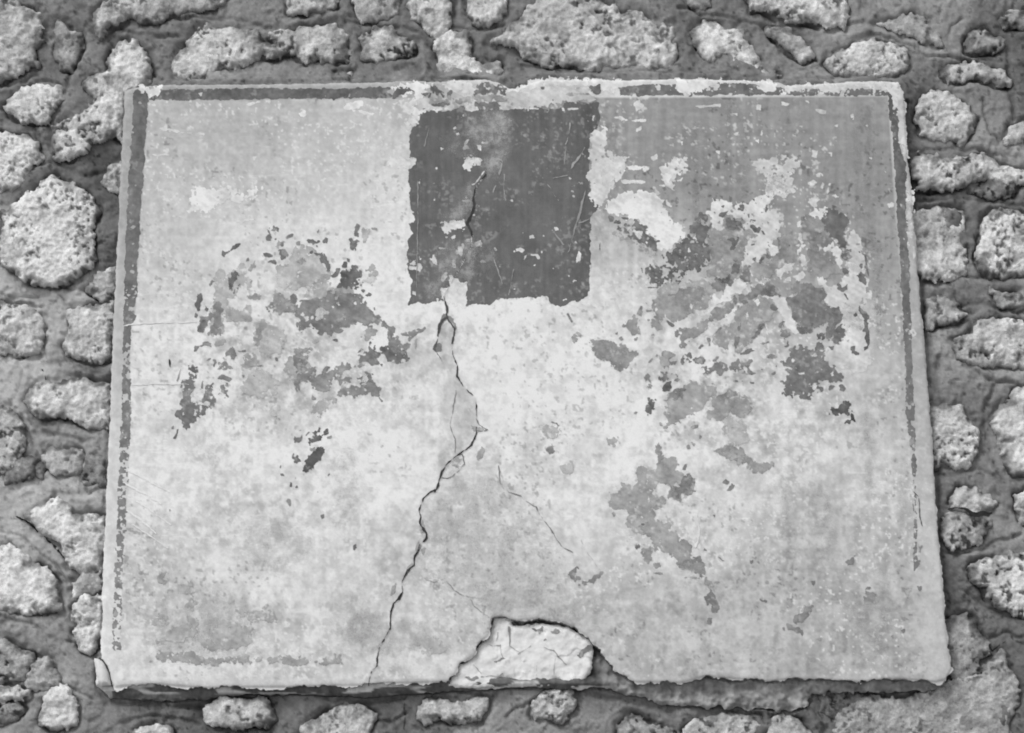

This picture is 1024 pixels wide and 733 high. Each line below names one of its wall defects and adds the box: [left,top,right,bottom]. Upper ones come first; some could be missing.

crack [465,172,486,237]
peeling [887,185,916,259]
peeling [390,75,910,475]
peeling [171,224,426,506]
crack [368,298,600,686]
peeling [608,443,720,624]
peeling [149,571,343,667]
spalling [449,617,593,689]
peeling [568,566,604,586]
peeling [782,600,814,635]
peeling [863,587,879,604]